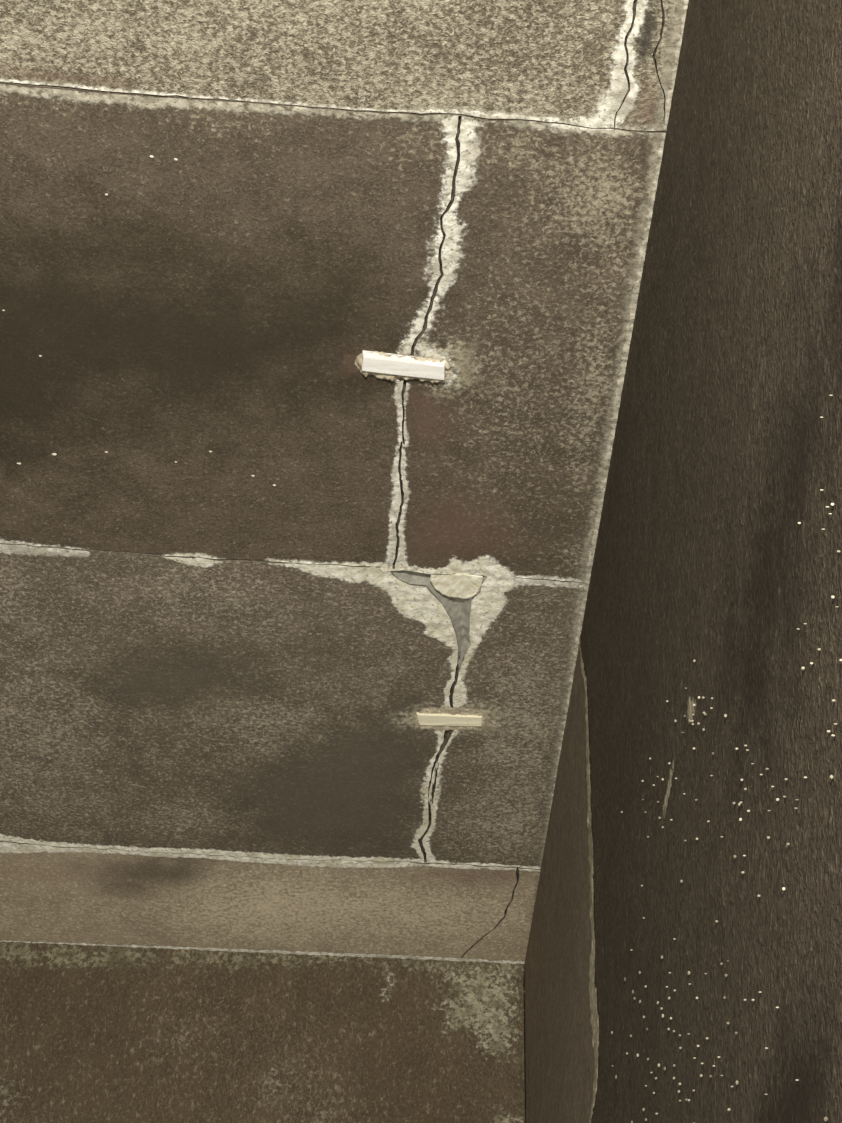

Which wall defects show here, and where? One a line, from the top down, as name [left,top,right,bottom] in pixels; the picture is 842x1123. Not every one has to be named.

crack [550,0,666,132]
crack [385,115,483,569]
spalling [363,555,518,669]
crack [410,647,475,864]
crack [461,867,519,958]